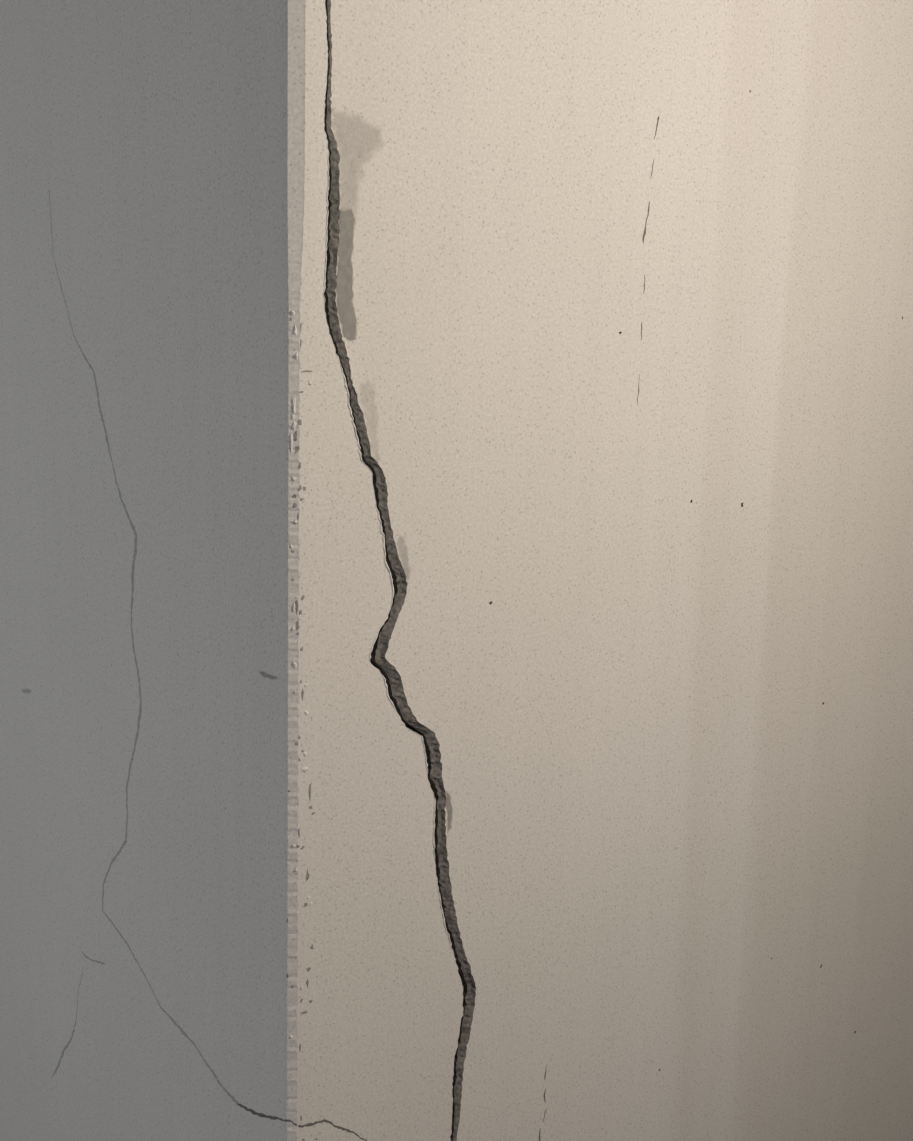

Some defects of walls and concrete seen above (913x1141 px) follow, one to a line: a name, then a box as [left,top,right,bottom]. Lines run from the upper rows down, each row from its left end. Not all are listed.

crack [49,191,367,1141]
crack [323,0,476,1141]